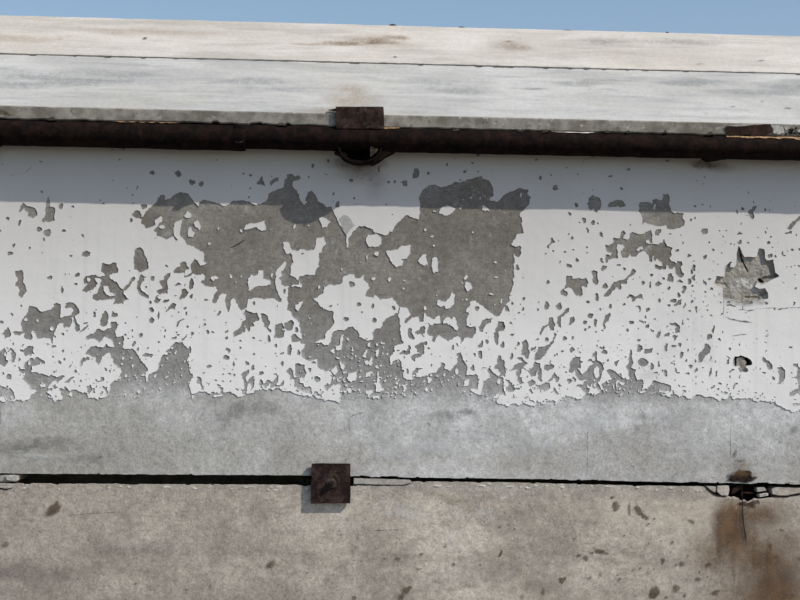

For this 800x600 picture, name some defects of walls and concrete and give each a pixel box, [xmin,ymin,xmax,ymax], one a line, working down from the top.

peeling [0,154,800,411]
corrosion [727,470,757,483]
crack [705,486,747,545]